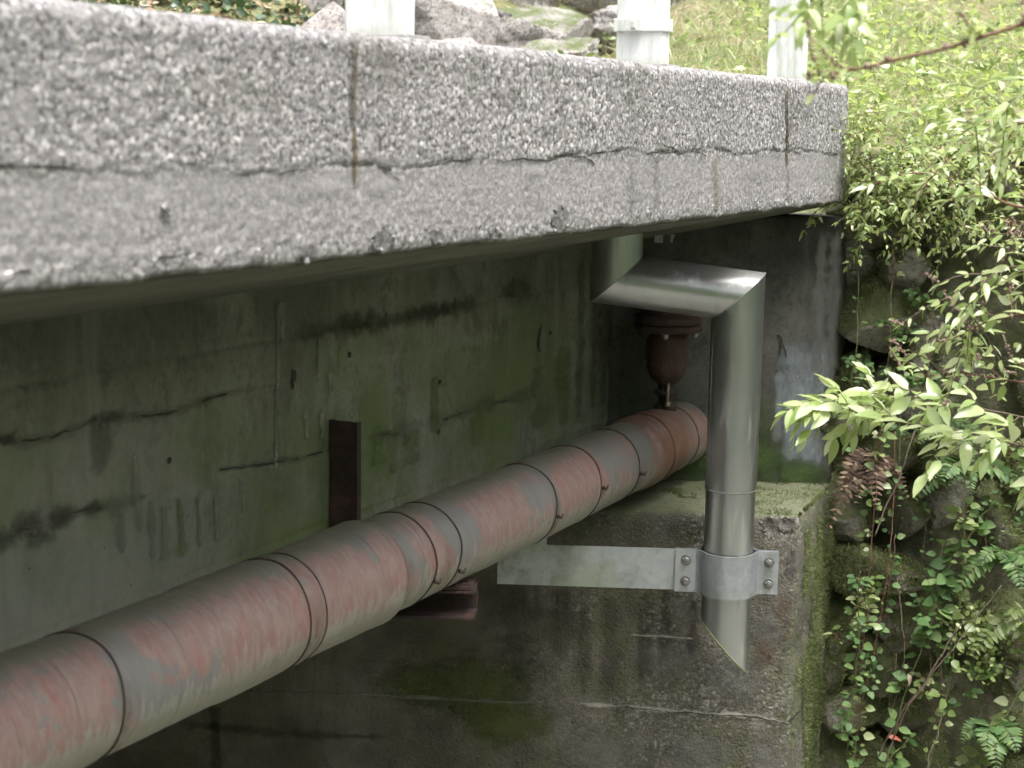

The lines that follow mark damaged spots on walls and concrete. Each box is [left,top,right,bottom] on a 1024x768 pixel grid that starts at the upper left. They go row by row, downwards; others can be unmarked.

crack [429,145,743,167]
crack [0,164,92,174]
crack [343,162,399,181]
spalling [552,204,569,232]
spalling [373,229,396,253]
crack [137,409,178,417]
crack [0,417,96,443]
crack [220,451,323,471]